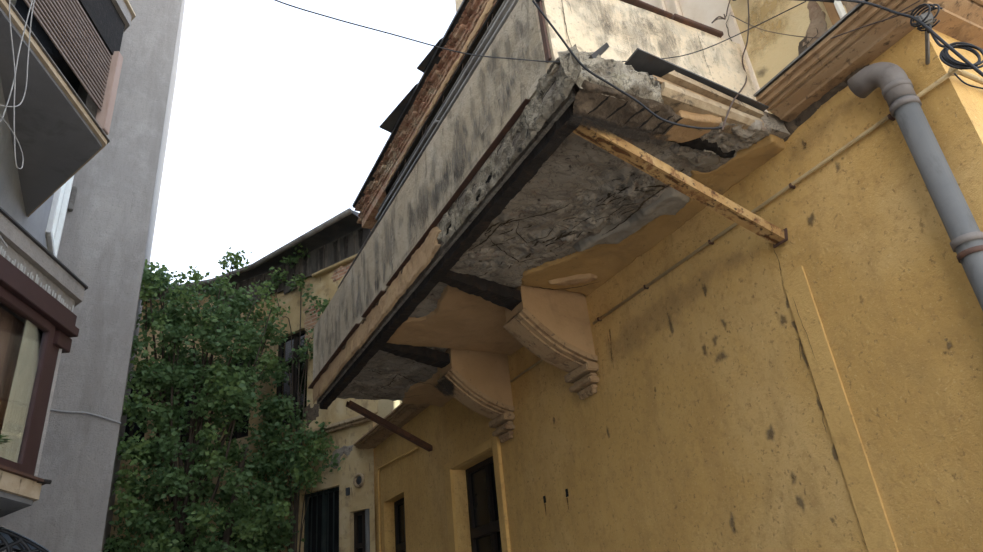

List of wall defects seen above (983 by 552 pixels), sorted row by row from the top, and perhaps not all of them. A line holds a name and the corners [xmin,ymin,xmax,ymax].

peeling [798,1,828,56]
flaking render [784,64,869,142]
spalling [436,44,773,290]
rust [575,129,644,170]
spalling [337,350,438,401]
crack [786,299,838,460]